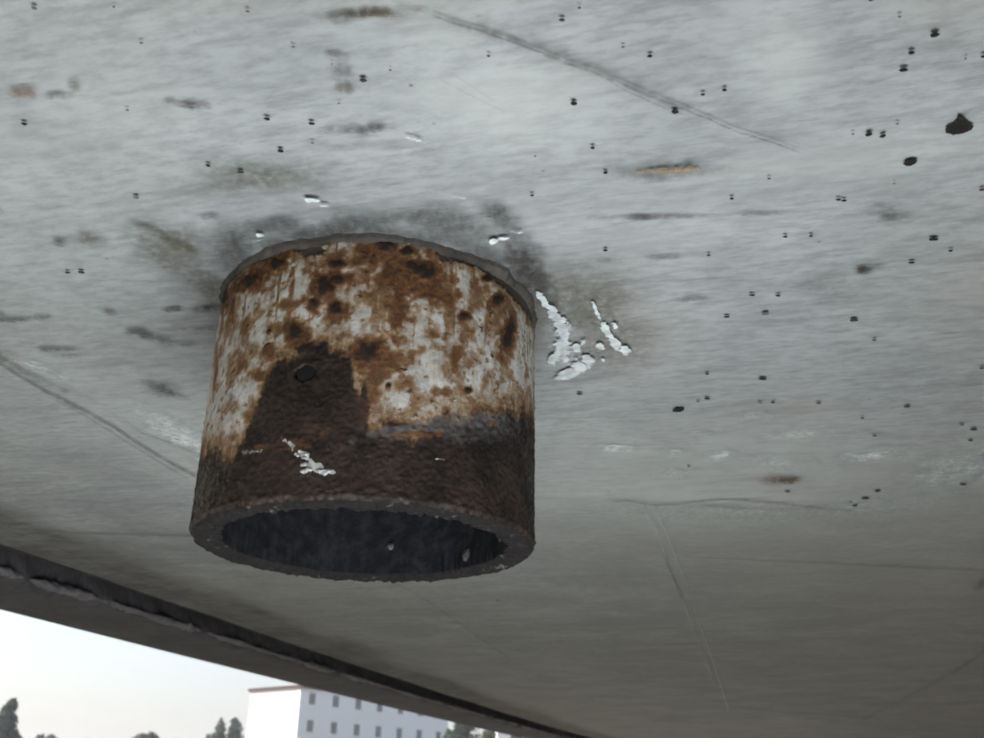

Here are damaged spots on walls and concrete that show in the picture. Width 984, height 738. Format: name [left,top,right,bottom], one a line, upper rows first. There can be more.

water stain [482,247,548,294]